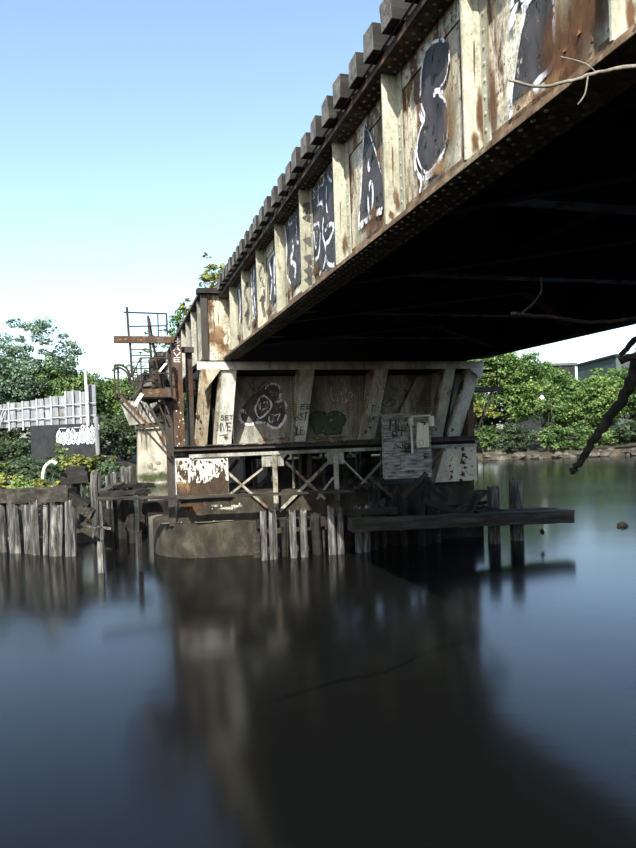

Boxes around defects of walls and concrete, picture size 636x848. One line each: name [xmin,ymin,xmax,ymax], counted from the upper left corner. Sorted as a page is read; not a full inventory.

rust [627,0,635,28]
rust [516,0,608,112]
rust [363,207,379,234]
peeling [176,458,229,496]